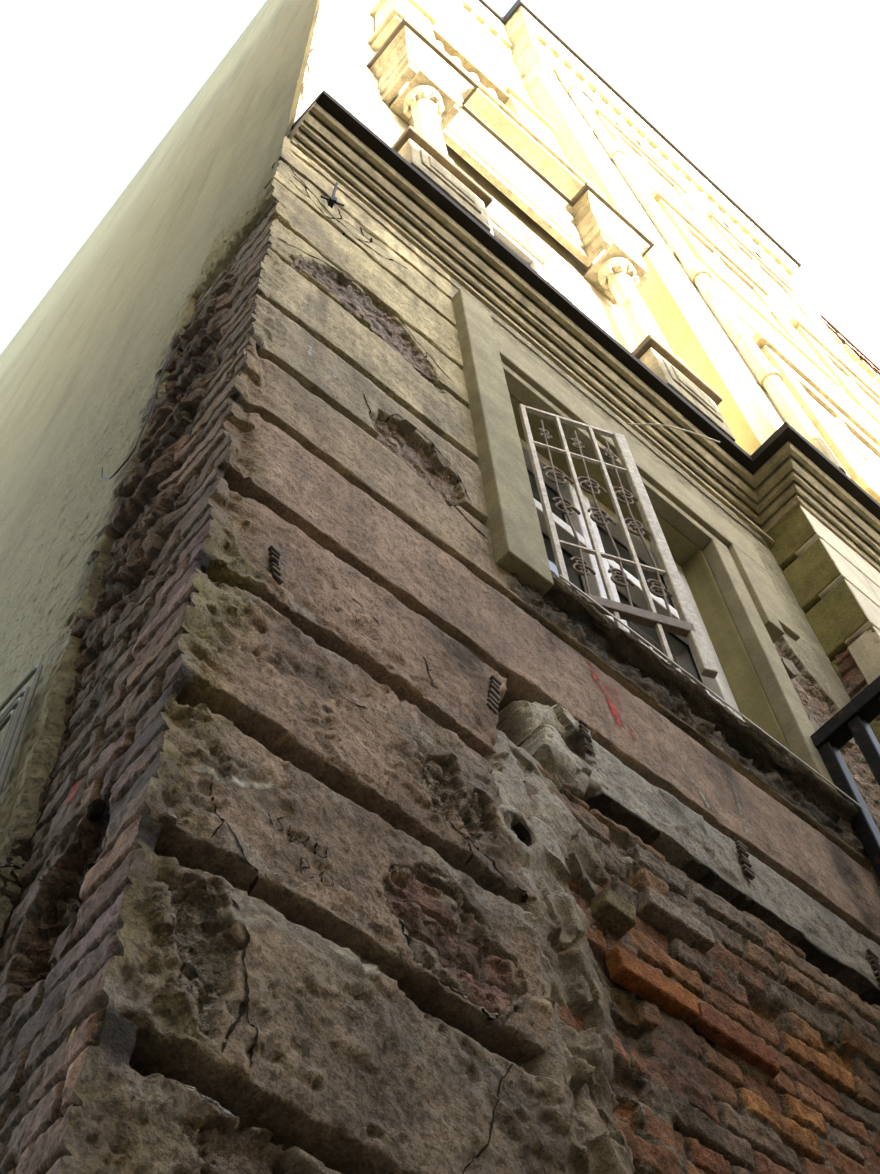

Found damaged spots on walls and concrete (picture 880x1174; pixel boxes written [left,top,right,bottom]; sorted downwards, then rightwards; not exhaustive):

spalling [289,256,441,393]
spalling [372,419,459,507]
spalling [0,200,287,1174]
flaking render [835,634,868,699]
crack [209,776,258,1067]
spalling [382,865,527,1024]
spalling [418,730,880,1174]
crack [463,1046,546,1174]